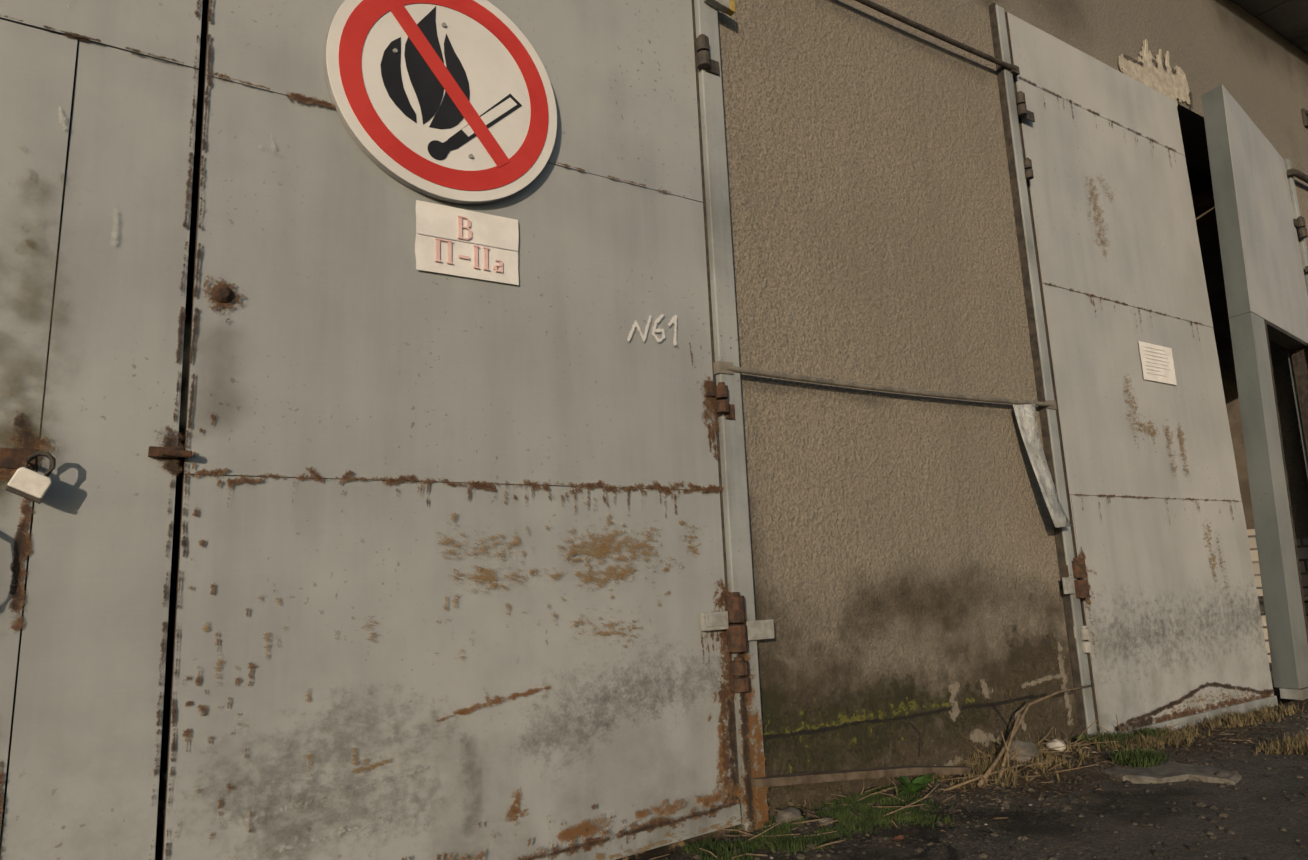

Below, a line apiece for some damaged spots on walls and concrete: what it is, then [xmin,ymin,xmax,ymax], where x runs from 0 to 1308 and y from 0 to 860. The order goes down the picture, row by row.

rust [43,25,101,42]
flaking render [1118,39,1193,109]
rust [126,0,724,647]
rust [0,413,51,459]
rust [0,468,17,486]
rust [9,498,34,631]
water stain [847,581,974,629]
rust [152,622,283,806]
rust [436,686,550,722]
rust [518,579,770,860]
water stain [760,640,1099,821]
water stain [694,825,737,847]